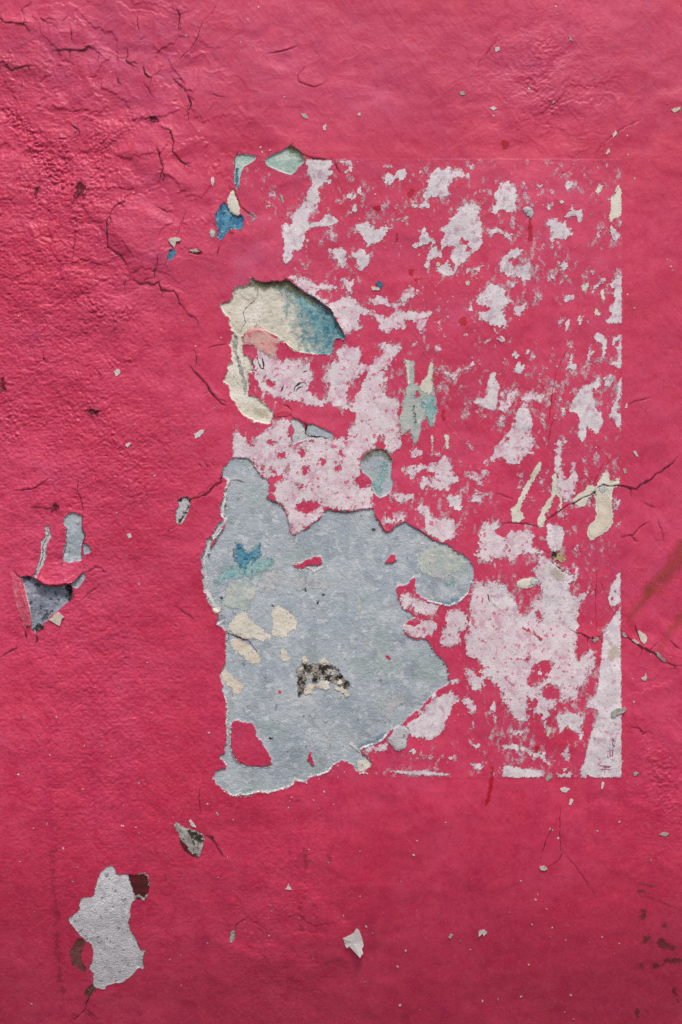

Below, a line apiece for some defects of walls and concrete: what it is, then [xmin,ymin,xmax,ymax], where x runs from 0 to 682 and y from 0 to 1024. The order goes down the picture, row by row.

crack [0,12,224,180]
peeling [210,143,326,240]
crack [106,194,198,322]
peeling [220,276,346,445]
peeling [10,503,91,642]
peeling [200,438,474,798]
peeling [516,577,540,589]
crack [500,456,678,572]
peeling [174,819,223,858]
peeling [69,866,150,997]
peeling [343,929,364,957]